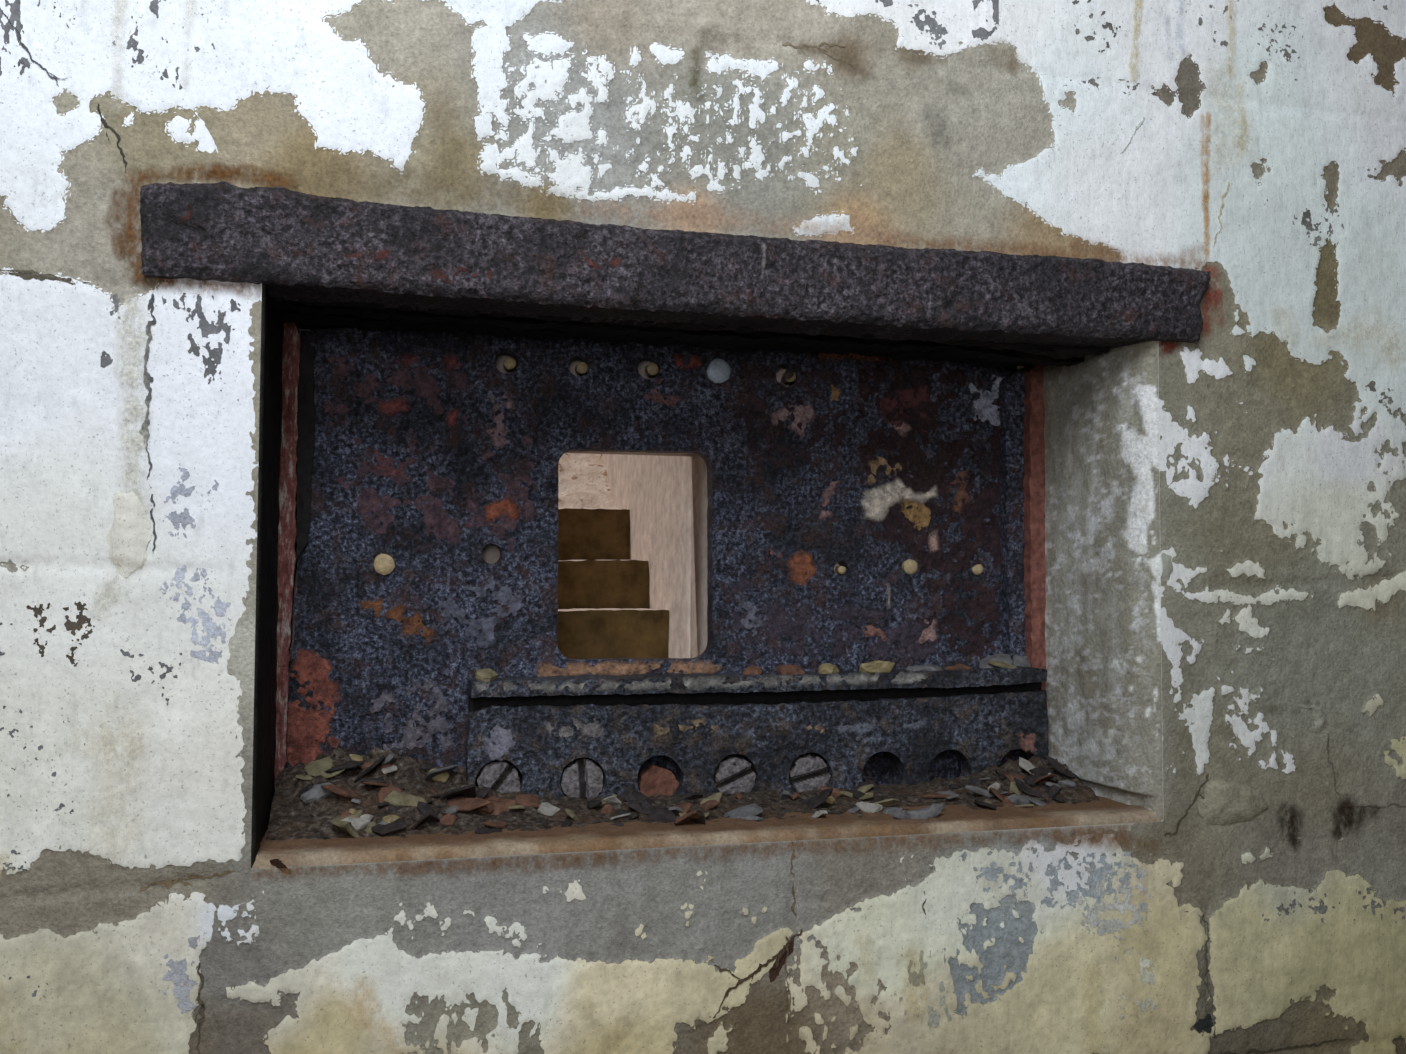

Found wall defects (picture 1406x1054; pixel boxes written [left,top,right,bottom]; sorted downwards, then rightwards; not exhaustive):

peeling [1118,53,1207,119]
peeling [1323,0,1406,97]
peeling [0,0,1123,384]
peeling [1292,161,1344,333]
rust [287,650,340,767]
rust [485,724,516,760]
rust [637,763,679,796]
peeling [0,261,1406,1054]
rust [475,653,1030,691]
leakage [1280,807,1298,848]
leakage [1333,799,1377,835]
crack [713,842,803,1054]